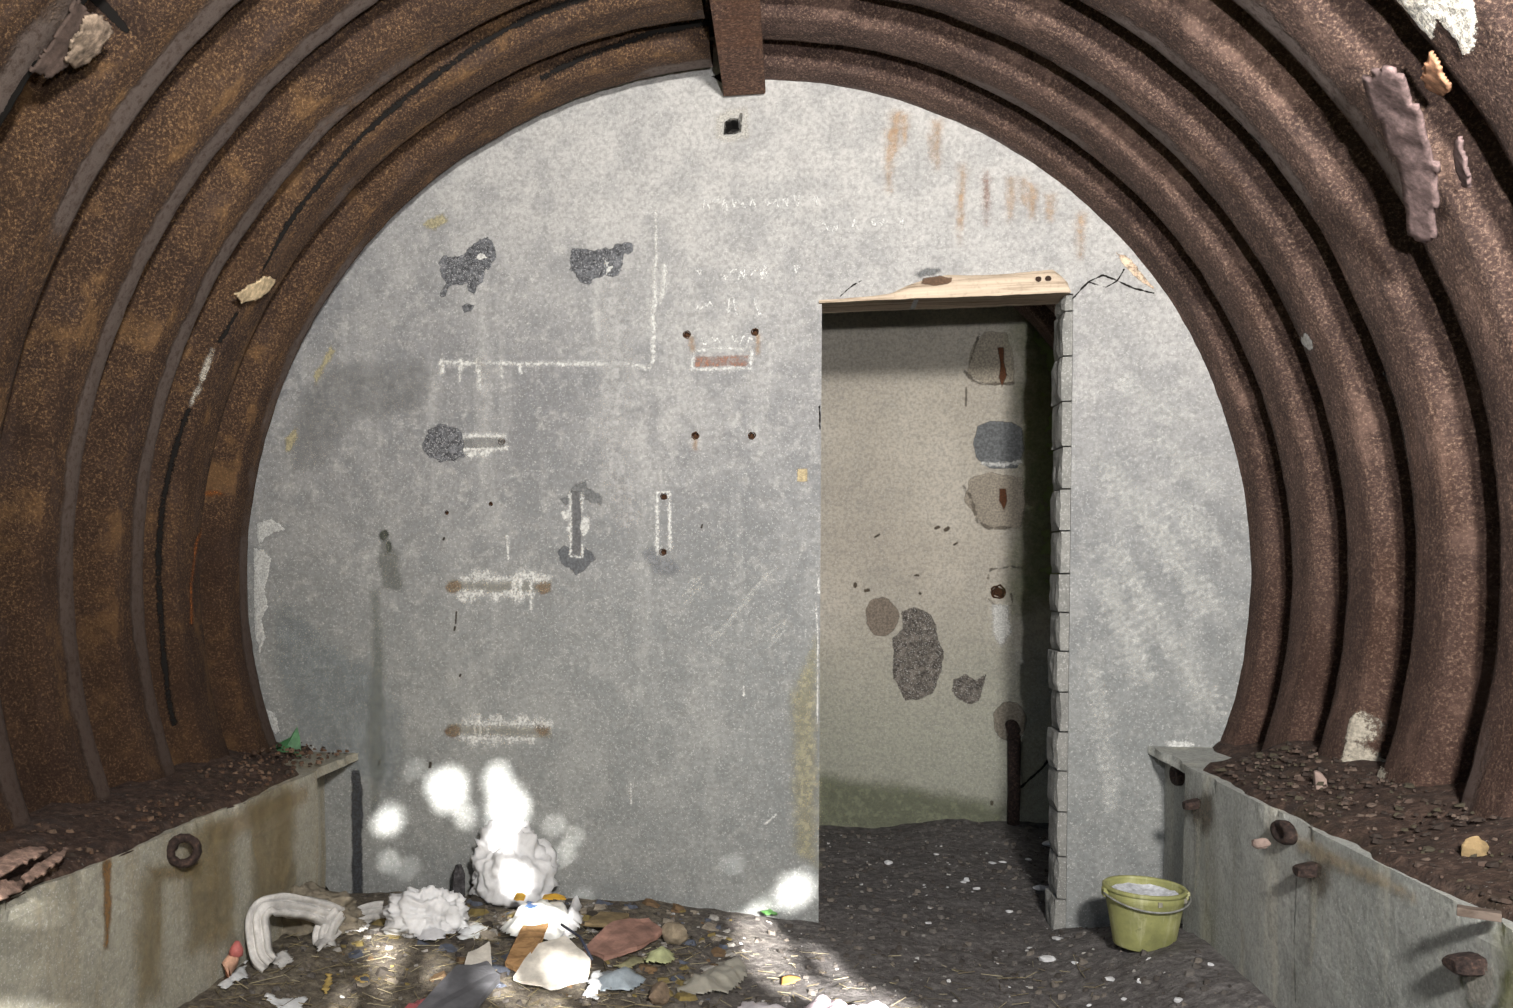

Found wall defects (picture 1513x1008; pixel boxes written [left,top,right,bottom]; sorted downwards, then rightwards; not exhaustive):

peeling [1397,0,1478,55]
spalling [438,238,496,313]
spalling [569,242,633,284]
crack [1073,269,1154,299]
spalling [422,424,508,463]
spalling [892,607,986,704]